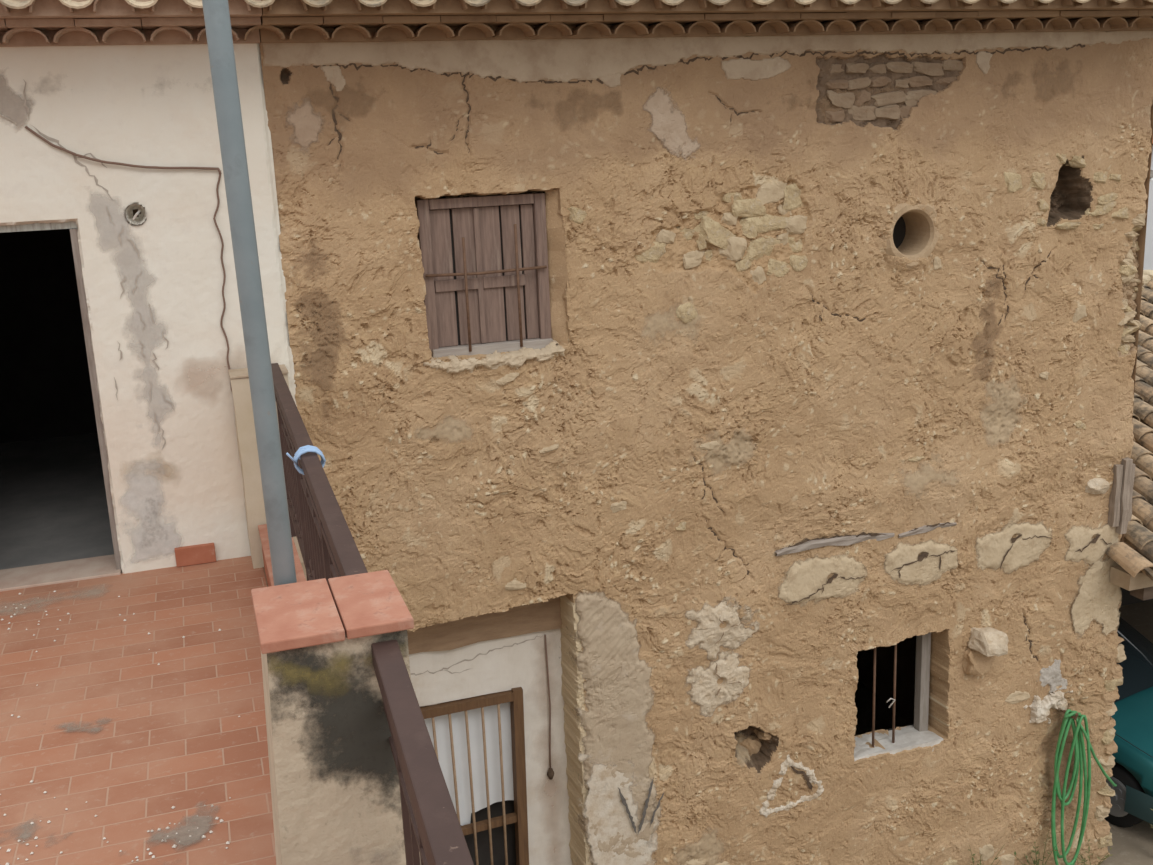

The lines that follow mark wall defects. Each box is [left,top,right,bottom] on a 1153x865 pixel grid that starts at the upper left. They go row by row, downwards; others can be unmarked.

crack [327,84,350,165]
crack [415,72,471,154]
peeling [259,30,1153,130]
crack [716,96,755,122]
crack [0,79,174,449]
spalling [1029,153,1147,357]
crack [410,636,539,676]
hole [734,726,779,773]